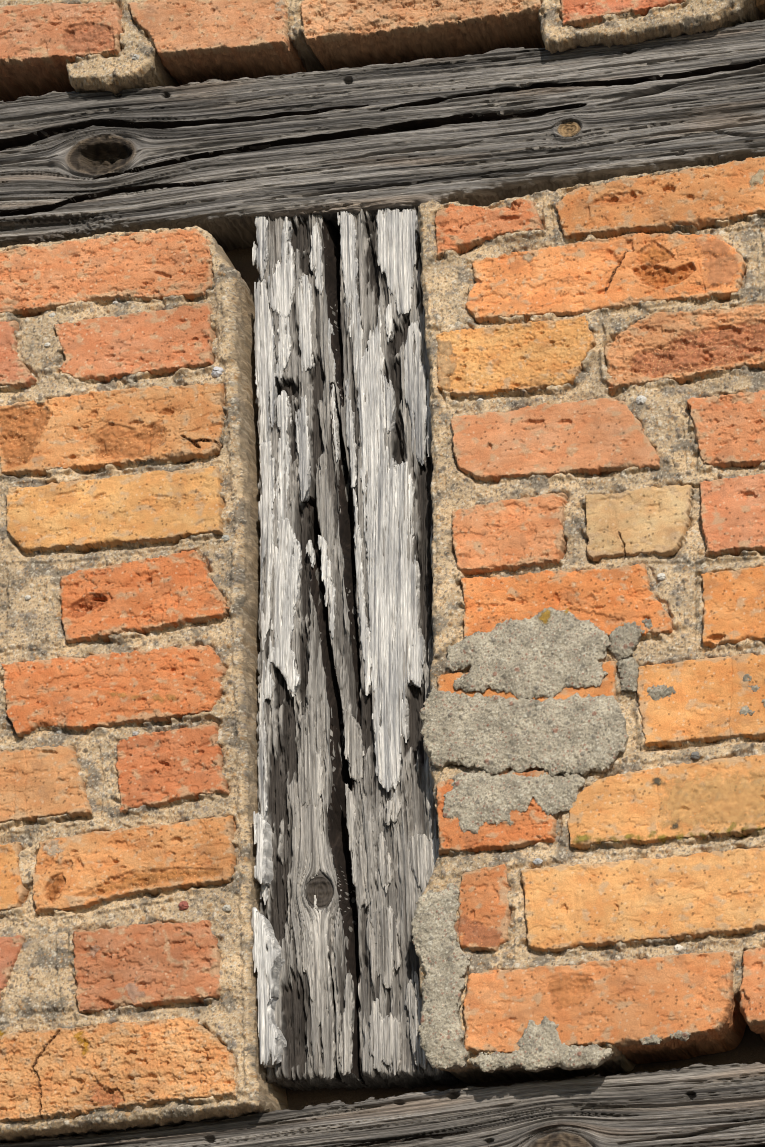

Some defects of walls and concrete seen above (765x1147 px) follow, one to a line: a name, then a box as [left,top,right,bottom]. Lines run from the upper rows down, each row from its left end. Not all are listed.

crack [32,1032,59,1118]